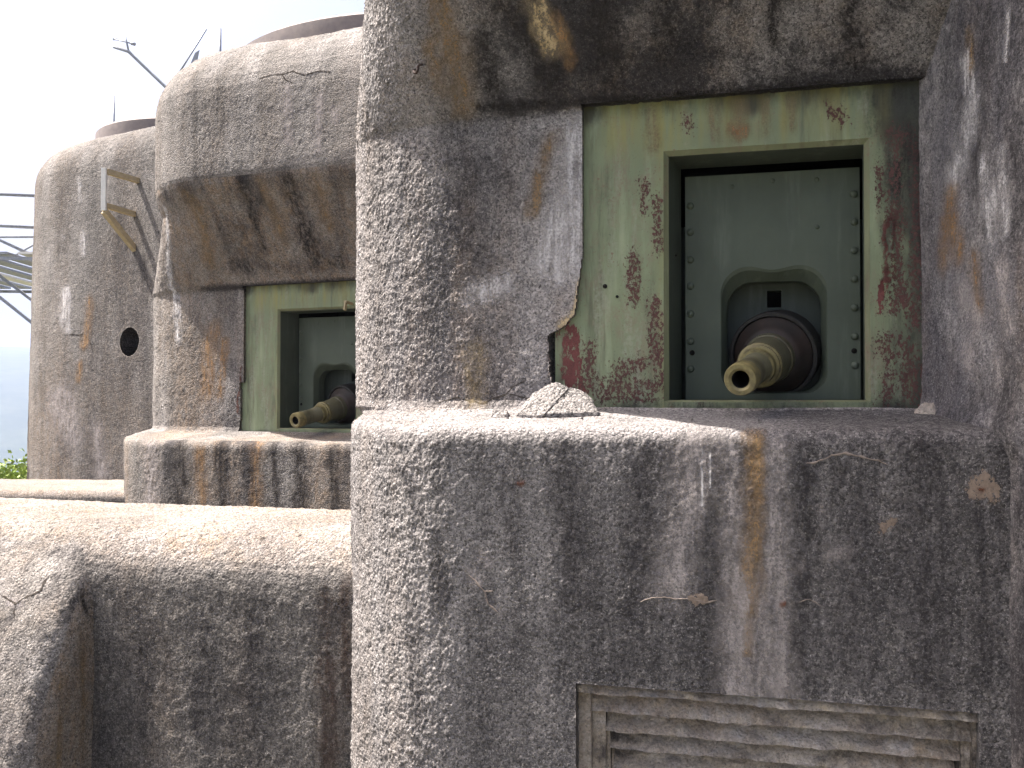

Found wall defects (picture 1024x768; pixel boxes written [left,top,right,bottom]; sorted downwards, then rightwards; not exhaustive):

crack [259,70,331,83]
water stain [280,172,323,261]
water stain [164,207,179,342]
peeling [547,171,664,407]
crack [807,451,888,465]
spalling [965,468,1001,505]
crack [641,596,717,604]